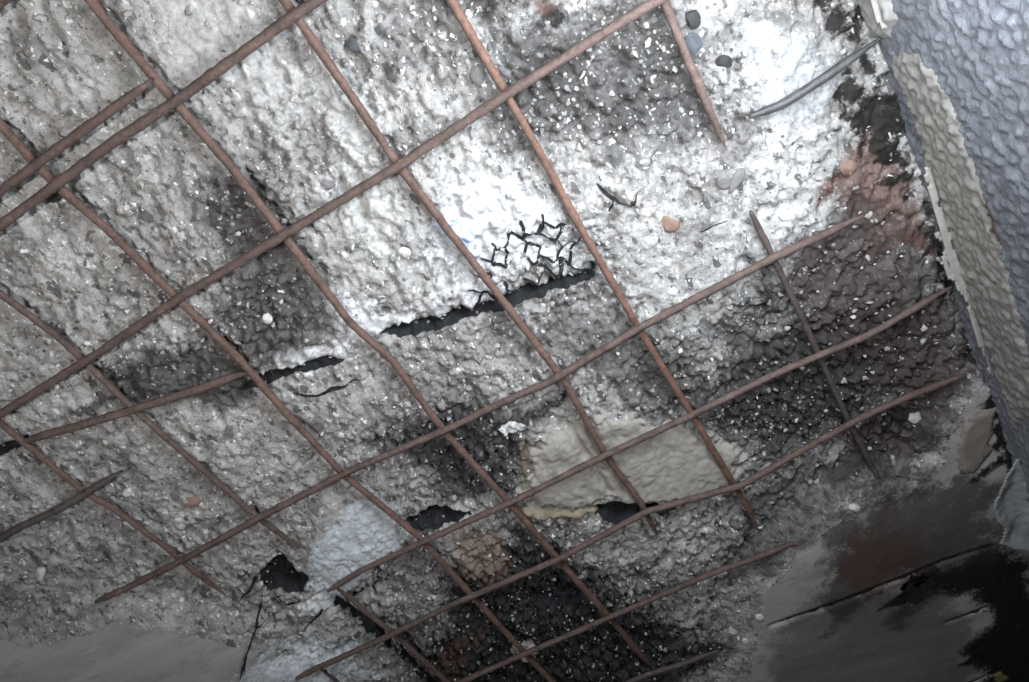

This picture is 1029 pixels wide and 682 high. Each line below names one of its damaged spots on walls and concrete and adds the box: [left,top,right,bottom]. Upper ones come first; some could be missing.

leakage [732,0,915,202]
crack [380,214,595,338]
spalling [851,227,884,261]
corrosion [788,132,982,485]
leakage [922,239,953,303]
crack [238,355,368,397]
efflorescence [306,498,408,597]
leakage [399,525,732,682]
leakage [818,394,1029,682]